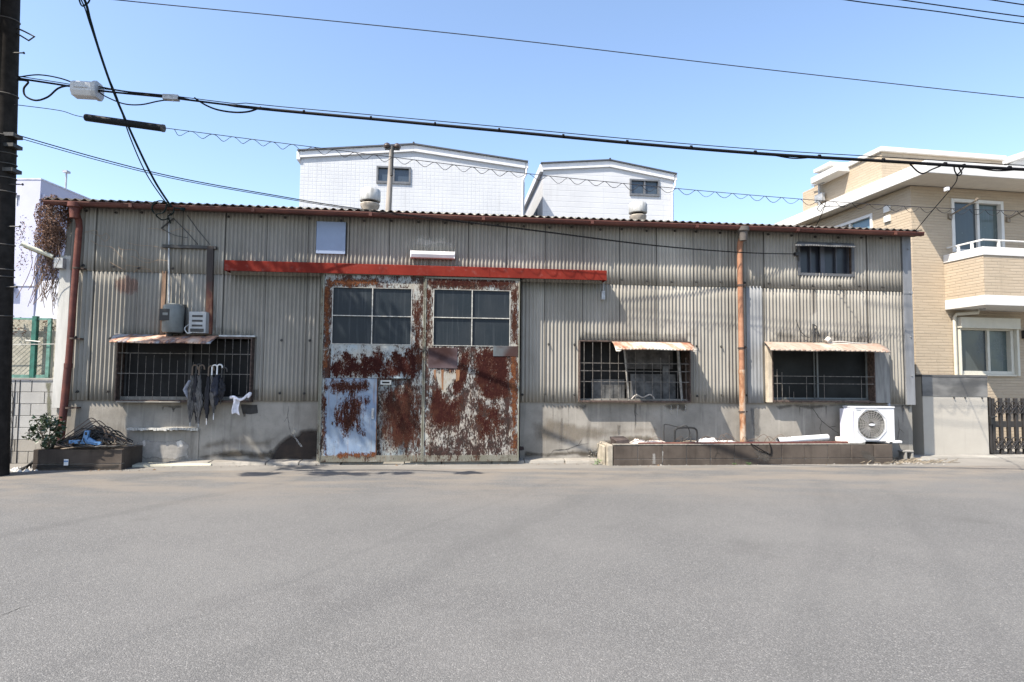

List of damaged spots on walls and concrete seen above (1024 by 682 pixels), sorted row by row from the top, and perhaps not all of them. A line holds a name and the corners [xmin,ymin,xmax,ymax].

corrosion [322,276,379,369]
corrosion [412,279,518,453]
corrosion [322,385,375,459]